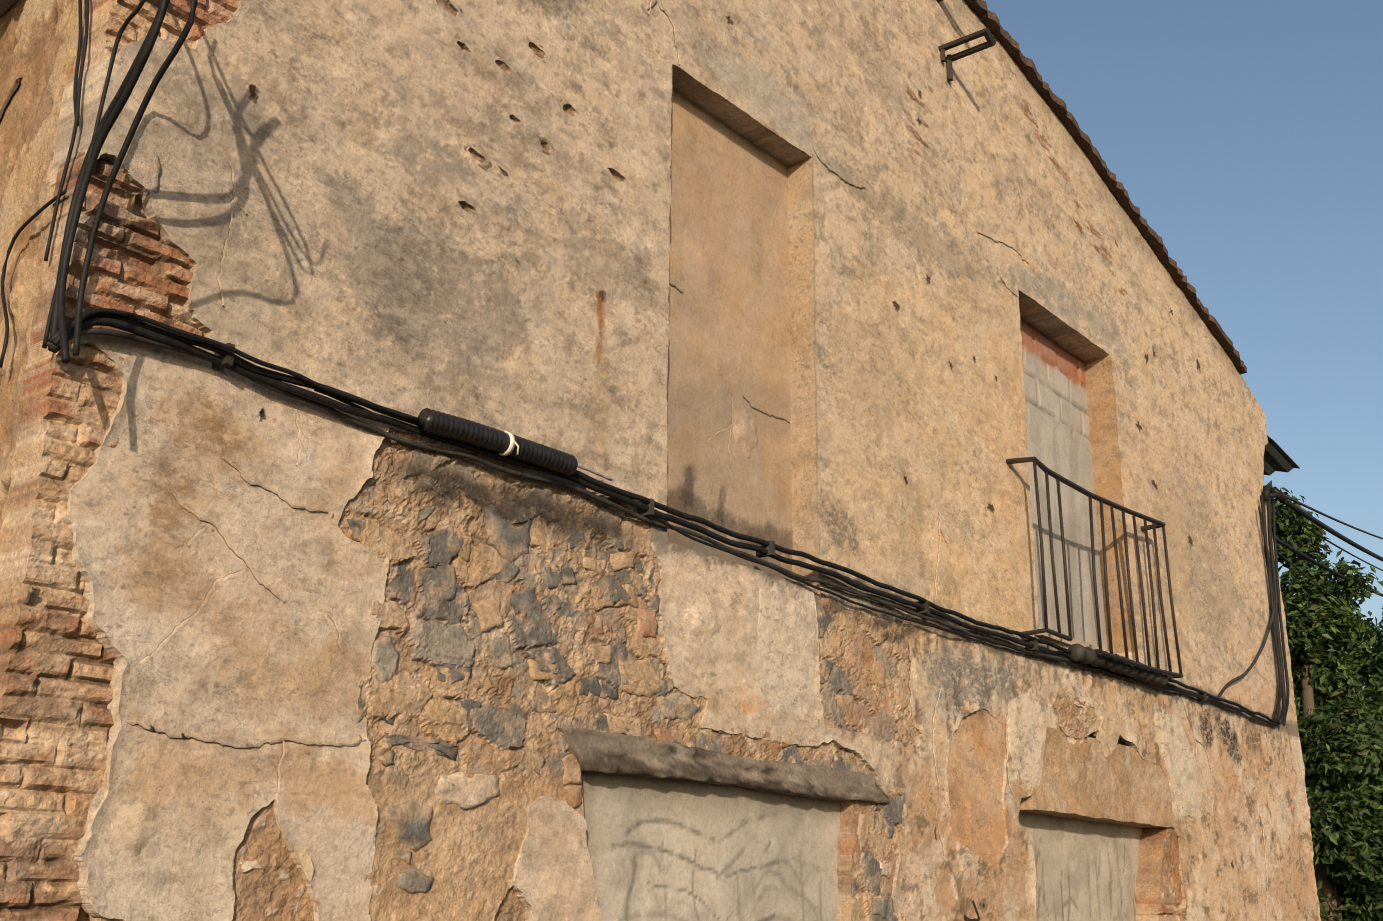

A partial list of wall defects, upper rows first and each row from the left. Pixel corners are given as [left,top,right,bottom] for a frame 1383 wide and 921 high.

flaking render [78,0,238,78]
crack [647,0,680,64]
crack [813,148,866,189]
crack [977,231,1029,297]
crack [221,413,328,512]
crack [705,392,790,468]
flaking render [0,152,206,921]
crack [140,491,285,665]
water stain [667,467,793,549]
flaking render [331,423,920,921]
crack [125,719,366,805]
flaking render [232,802,314,921]